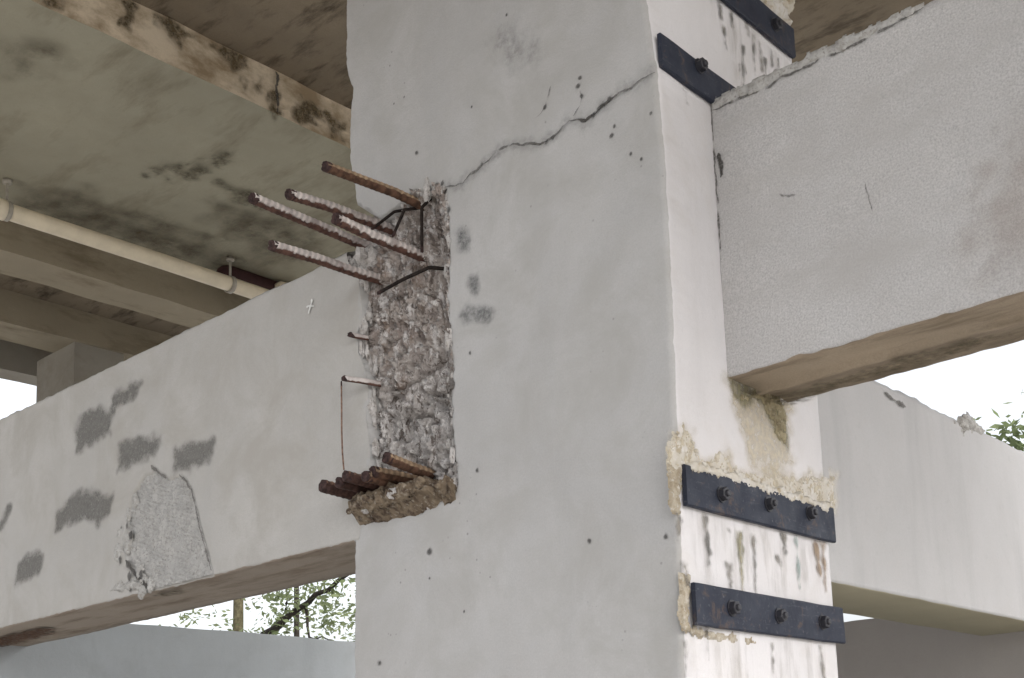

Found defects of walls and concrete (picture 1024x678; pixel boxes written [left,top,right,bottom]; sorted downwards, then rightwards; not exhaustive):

damp [118,0,138,28]
damp [157,16,191,48]
damp [245,84,346,138]
crack [430,72,655,196]
spalling [248,161,458,525]
spalling [731,379,789,472]
spalling [110,465,214,600]